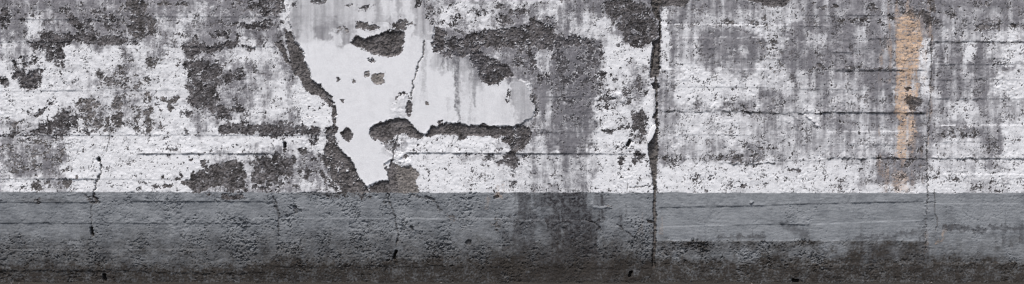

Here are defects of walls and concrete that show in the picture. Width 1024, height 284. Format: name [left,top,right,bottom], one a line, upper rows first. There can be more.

crack [83,127,112,227]
spalling [0,0,649,205]
crack [585,0,662,268]
leakage [501,0,820,283]
leakage [769,1,888,134]
leakage [838,218,930,278]
rust [876,0,934,193]
leakage [937,29,999,113]
leakage [941,206,1024,271]